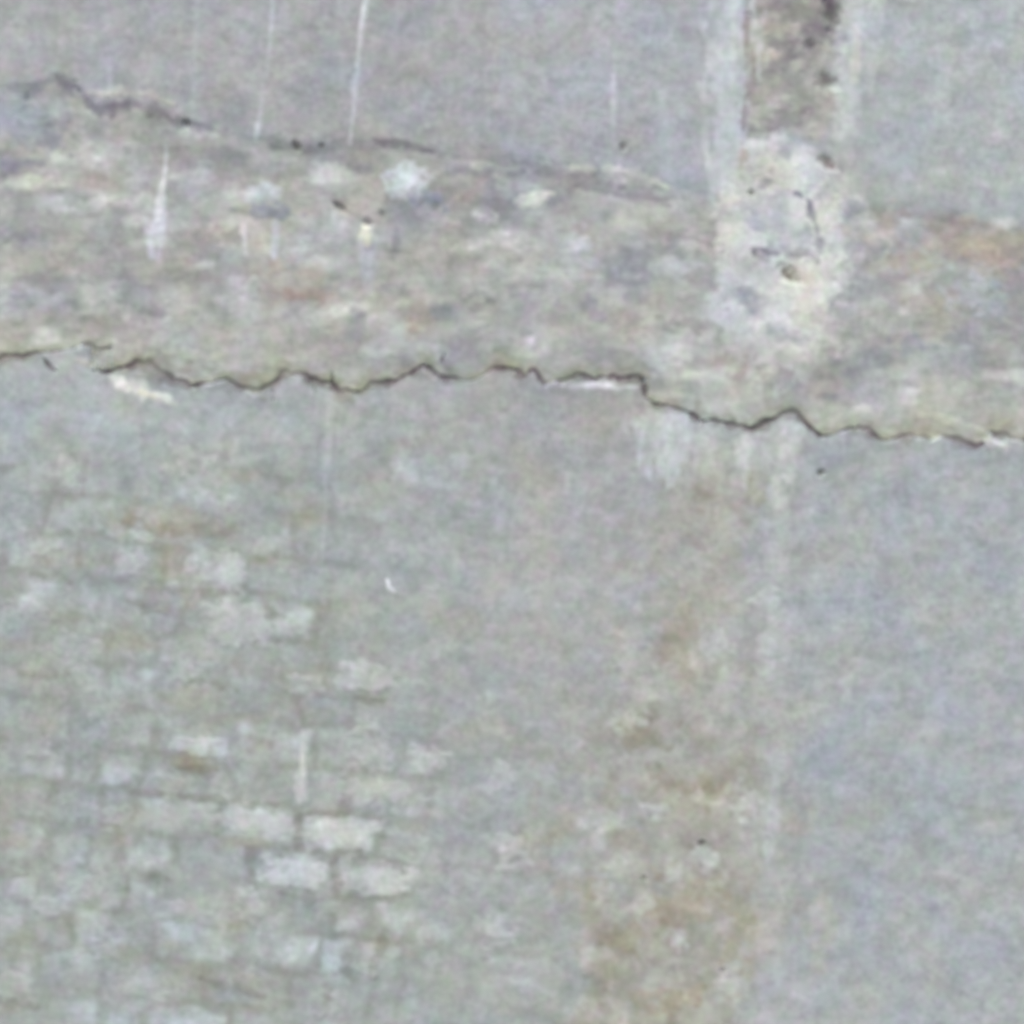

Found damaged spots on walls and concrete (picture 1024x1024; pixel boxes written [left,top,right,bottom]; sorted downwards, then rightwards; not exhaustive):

crack [0,327,1024,453]